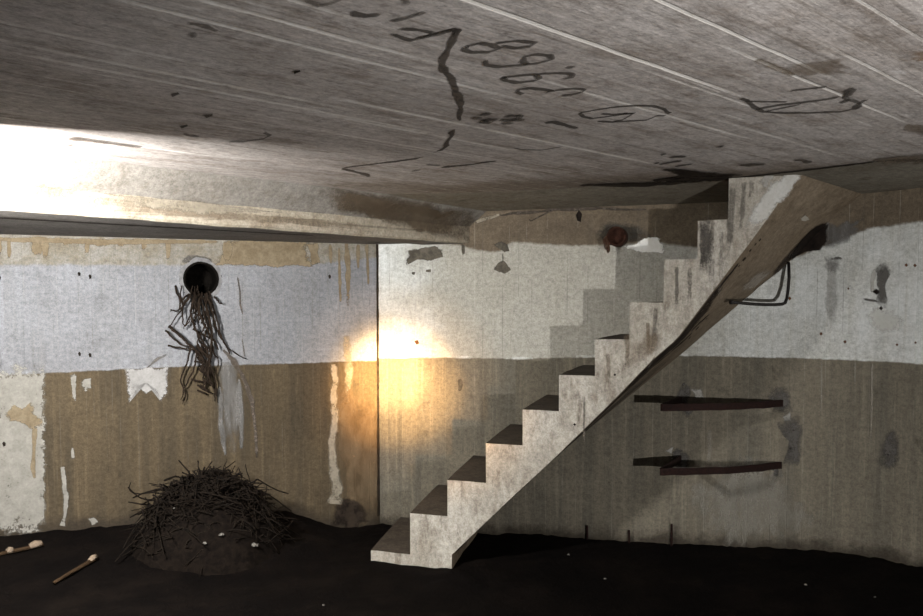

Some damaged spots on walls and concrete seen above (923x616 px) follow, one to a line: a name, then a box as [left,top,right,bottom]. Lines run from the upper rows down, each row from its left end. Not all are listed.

water stain [580,175,733,187]
water stain [602,223,649,241]
water stain [700,175,800,273]
water stain [745,221,858,288]
peeling [126,367,168,401]
peeling [0,364,47,533]